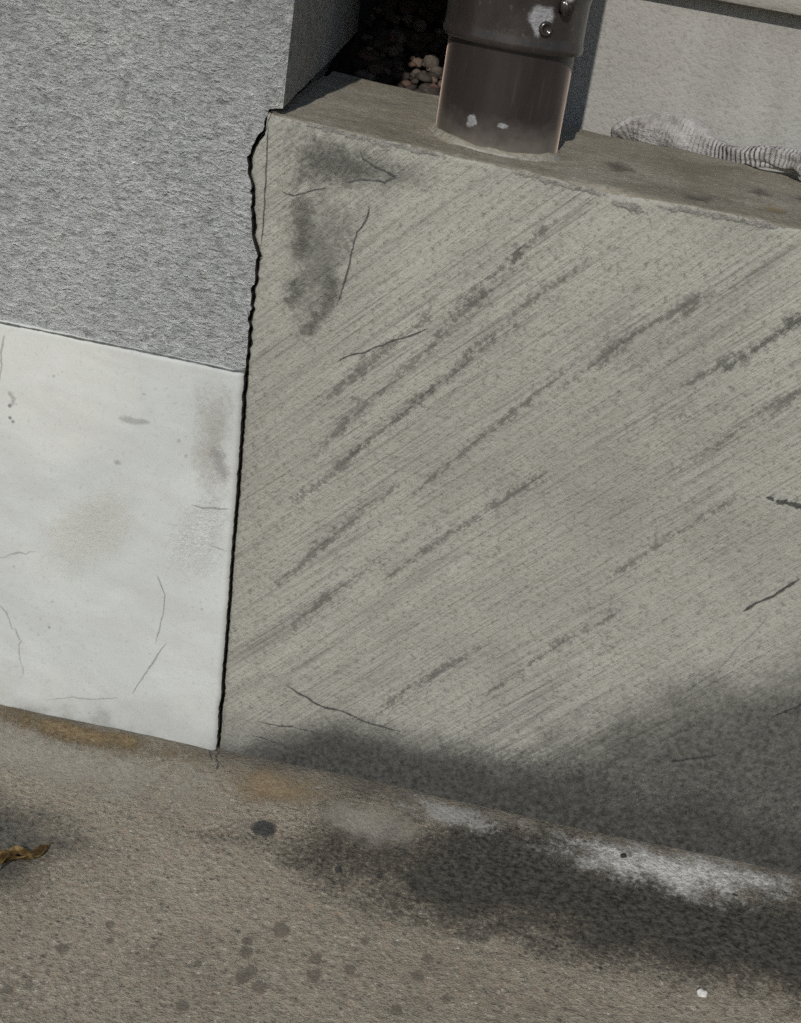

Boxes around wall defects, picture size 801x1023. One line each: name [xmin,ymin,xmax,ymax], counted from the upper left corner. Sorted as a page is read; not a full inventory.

crack [0,75,325,770]
damp [235,937,265,994]
damp [269,695,801,1000]